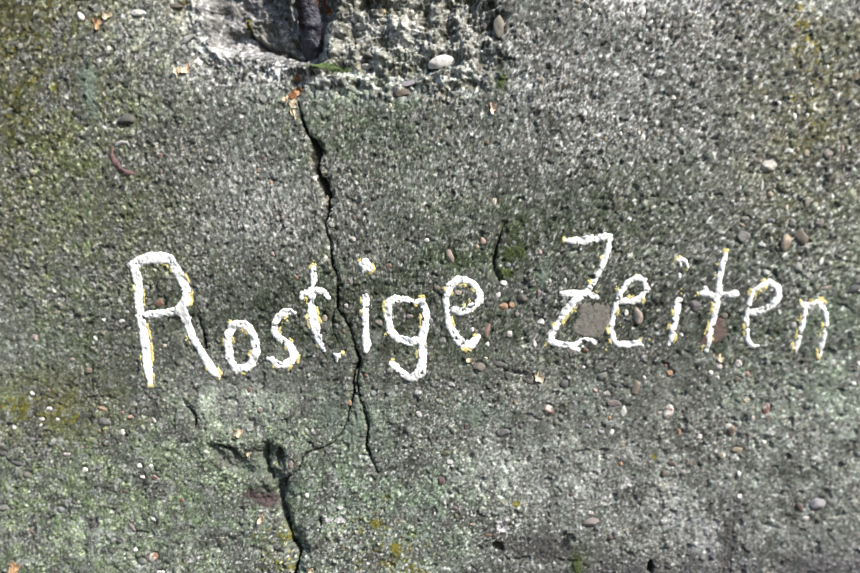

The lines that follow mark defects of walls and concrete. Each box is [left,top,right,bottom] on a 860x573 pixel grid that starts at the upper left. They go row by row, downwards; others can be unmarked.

corrosion [295,0,307,31]
peeling [173,63,190,78]
spalling [196,0,513,106]
crack [301,115,373,461]
crack [287,517,303,573]